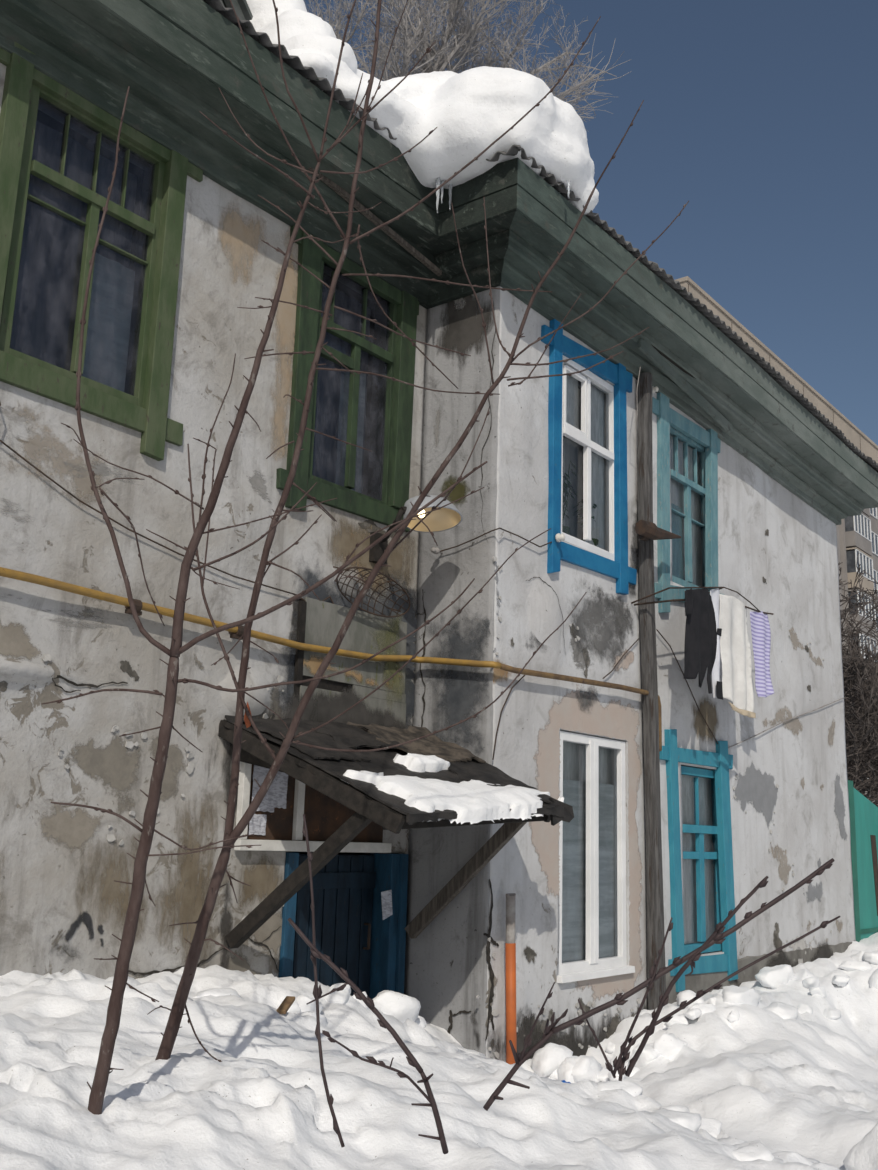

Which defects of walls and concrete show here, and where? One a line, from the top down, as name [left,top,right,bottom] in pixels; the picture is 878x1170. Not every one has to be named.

damp [439,295,493,361]
spalling [0,622,51,661]
damp [433,620,490,751]
peeling [571,635,586,669]
spalling [58,725,194,816]
damp [223,741,238,809]
spalling [41,802,124,852]
damp [79,852,147,940]
damp [160,805,279,969]
peeling [529,691,642,1000]
spalling [733,764,795,892]
damp [472,998,648,1060]